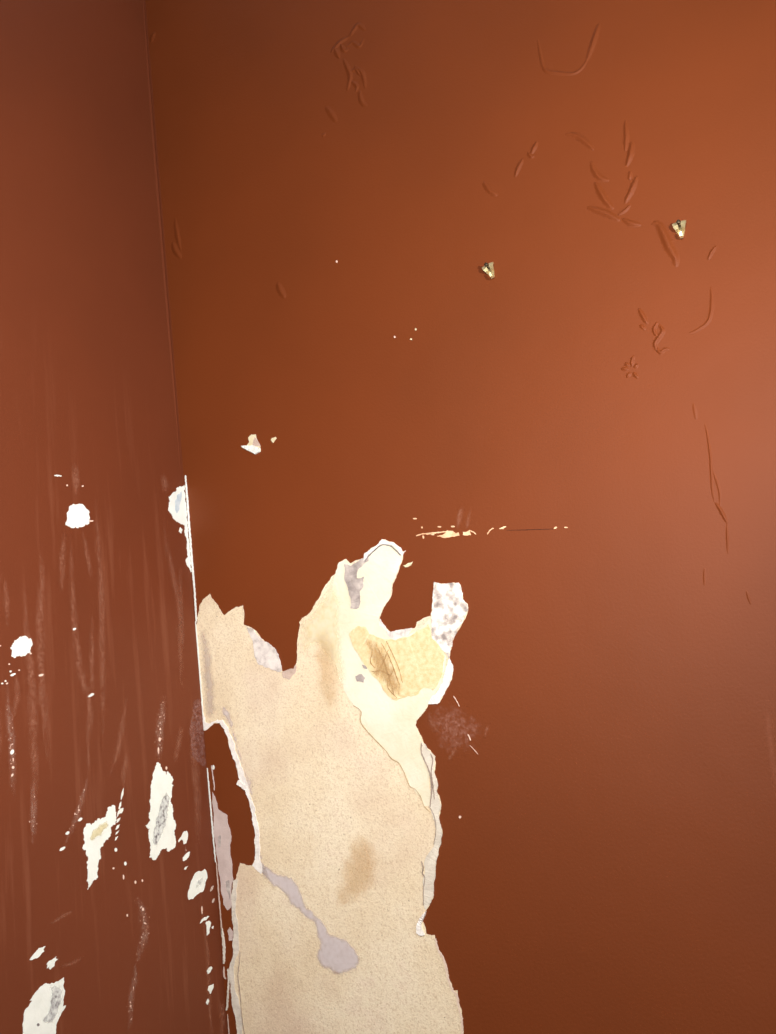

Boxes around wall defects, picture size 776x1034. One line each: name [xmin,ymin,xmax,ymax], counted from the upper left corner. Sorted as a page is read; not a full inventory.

peeling [241,434,277,454]
peeling [65,504,93,528]
peeling [168,485,192,572]
peeling [145,539,468,1034]
peeling [78,788,124,890]
peeling [22,946,66,1034]